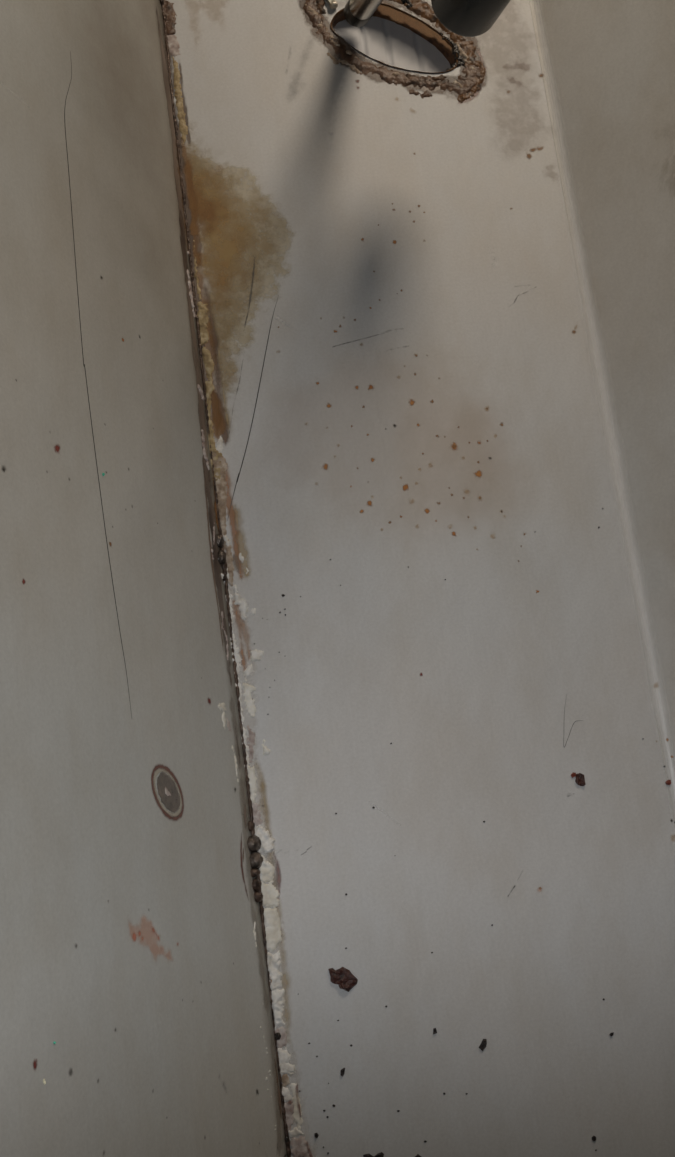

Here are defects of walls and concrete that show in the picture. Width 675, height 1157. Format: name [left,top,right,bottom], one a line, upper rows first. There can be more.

corrosion [300,0,486,103]